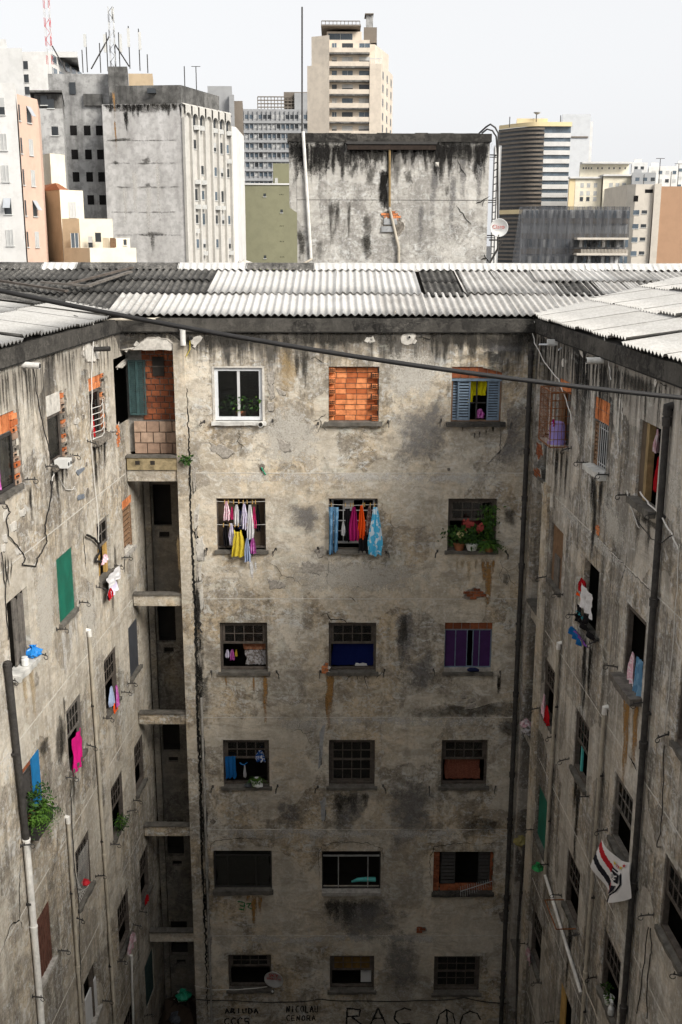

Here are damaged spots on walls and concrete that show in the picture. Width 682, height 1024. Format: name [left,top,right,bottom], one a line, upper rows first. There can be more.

water stain [289,142,488,236]
water stain [320,202,351,249]
spalling [116,337,174,370]
water stain [423,333,682,438]
flaking render [6,413,22,485]
spalling [462,586,489,600]
corrosion [481,561,495,604]
crack [186,390,274,1014]
corrosion [325,676,334,723]
corrosion [622,700,639,774]